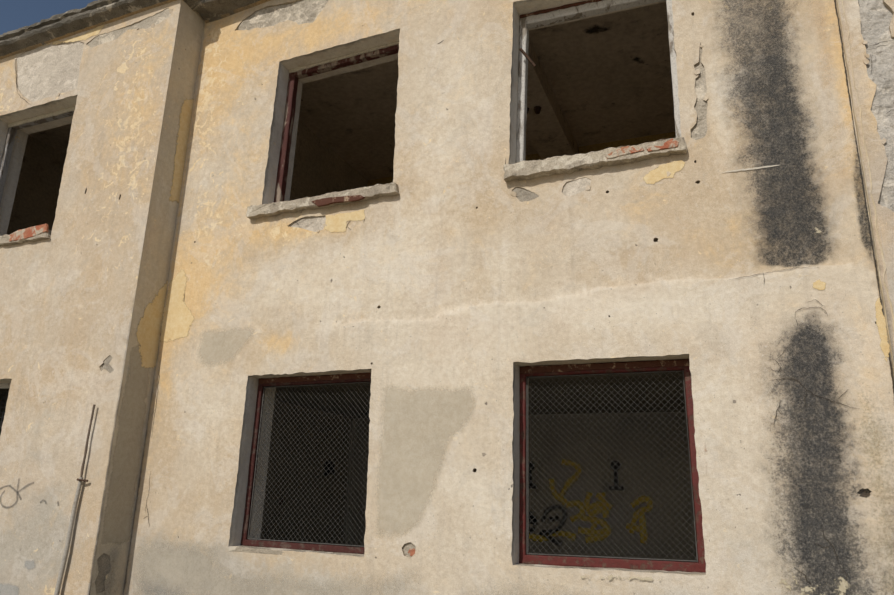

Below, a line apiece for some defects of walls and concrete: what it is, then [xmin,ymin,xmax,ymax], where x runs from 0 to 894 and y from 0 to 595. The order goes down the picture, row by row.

flaking render [14,8,173,102]
flaking render [235,0,328,31]
peeling [288,209,365,232]
flaking render [605,138,679,159]
peeling [644,159,685,184]
flaking render [691,42,708,140]
leakage [724,0,831,267]
crack [834,0,892,316]
flaking render [858,0,894,212]
peeling [136,270,194,368]
crack [886,341,894,393]
leakage [771,316,875,595]